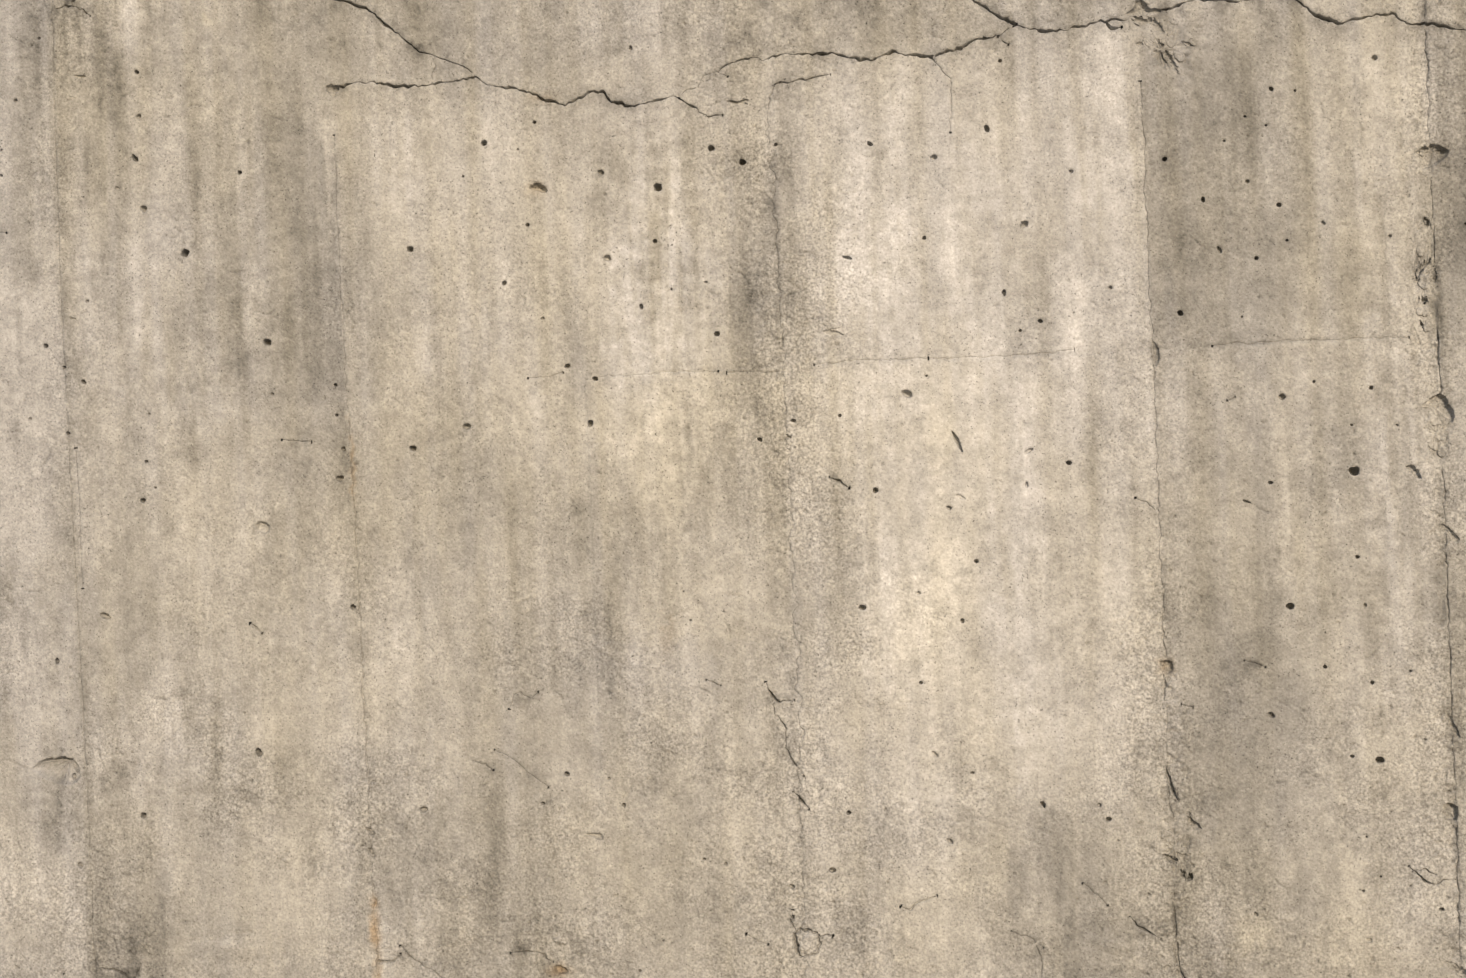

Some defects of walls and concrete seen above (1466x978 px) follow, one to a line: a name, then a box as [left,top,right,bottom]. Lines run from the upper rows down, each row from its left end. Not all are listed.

crack [321,0,1466,132]
spalling [28,754,84,788]